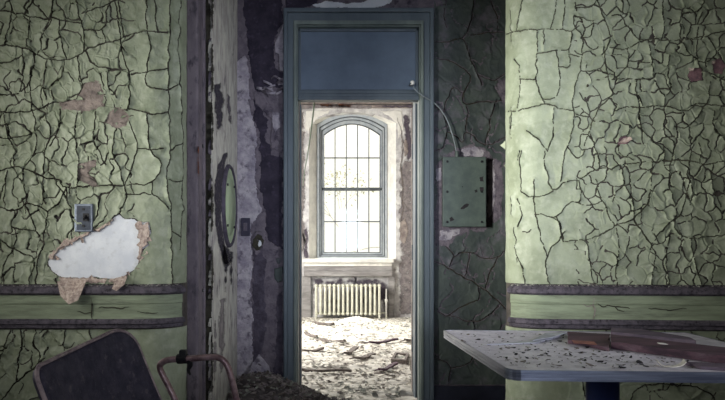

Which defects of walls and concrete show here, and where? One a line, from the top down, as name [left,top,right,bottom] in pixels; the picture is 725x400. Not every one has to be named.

crack [0,329,41,399]
crack [0,0,183,284]
peeling [0,0,187,304]
flaking render [206,0,214,400]
peeling [237,0,725,400]
crack [434,0,725,330]